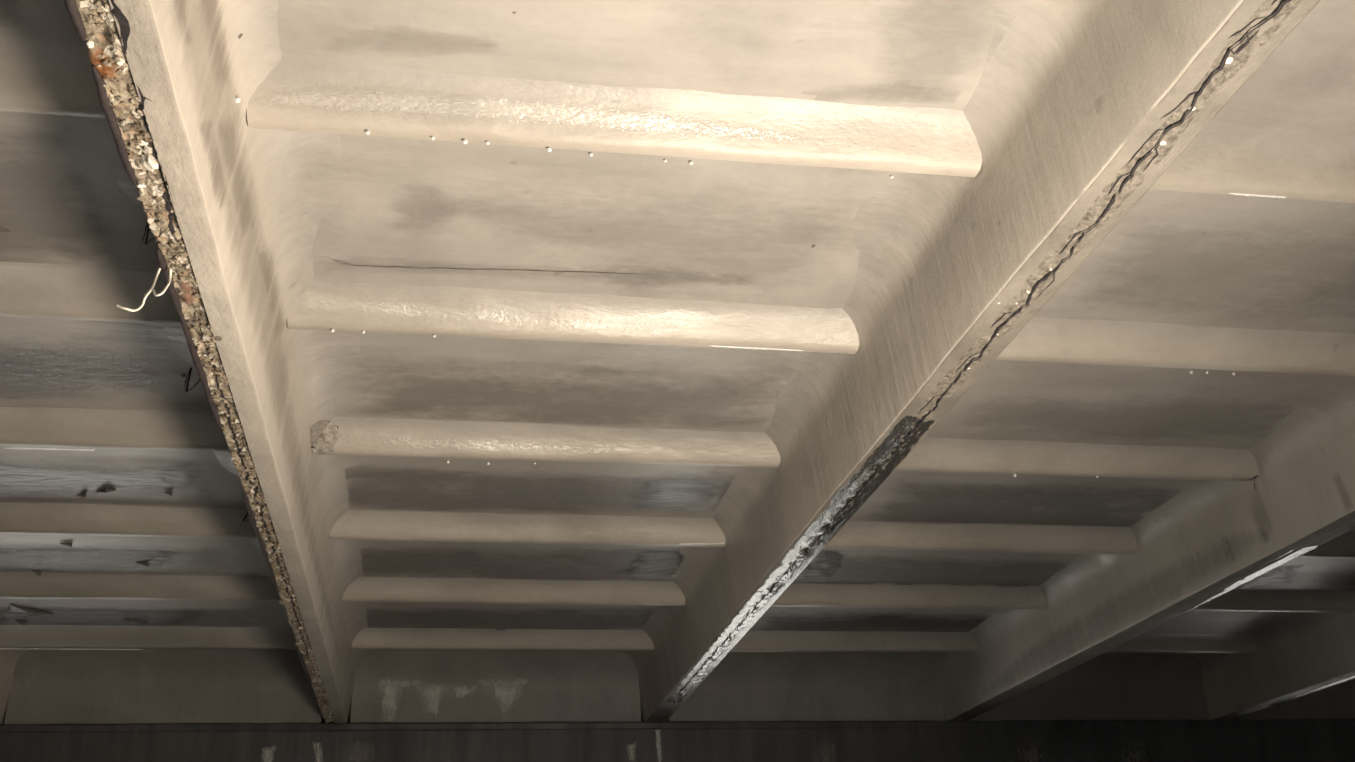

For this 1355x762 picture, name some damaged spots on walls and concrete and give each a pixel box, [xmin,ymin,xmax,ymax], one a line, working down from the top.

spalling [64,0,335,724]
spalling [310,420,341,455]
crack [666,0,1303,705]